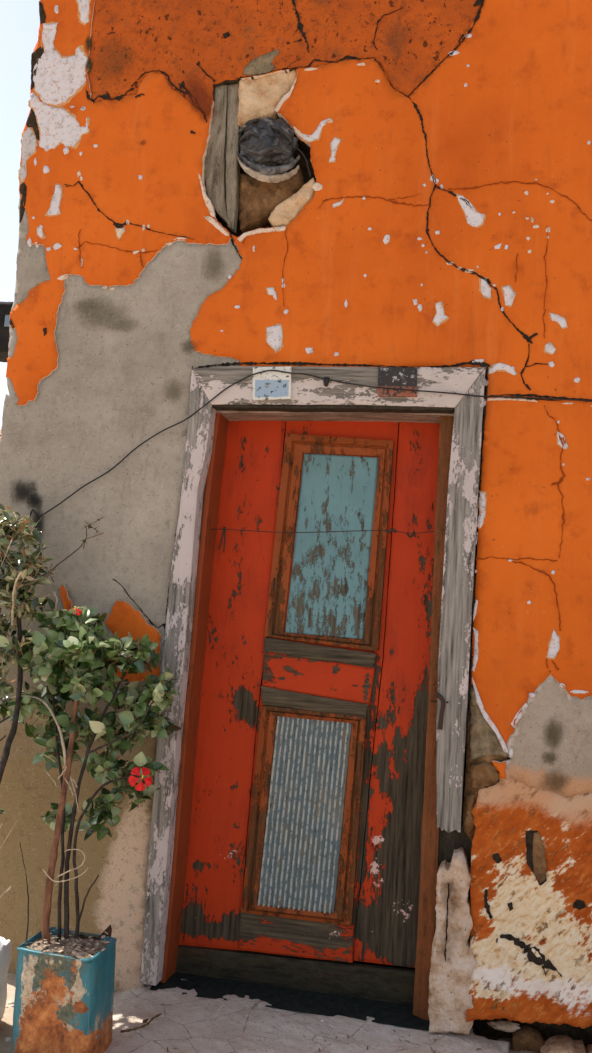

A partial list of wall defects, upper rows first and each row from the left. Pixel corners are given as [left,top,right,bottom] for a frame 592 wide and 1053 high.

crack [65,181,194,267]
peeling [455,193,550,253]
peeling [479,277,517,311]
crack [86,0,592,749]
peeling [472,359,518,386]
damp [14,482,43,533]
peeling [0,0,481,992]
peeling [476,491,487,544]
peeling [462,600,592,845]